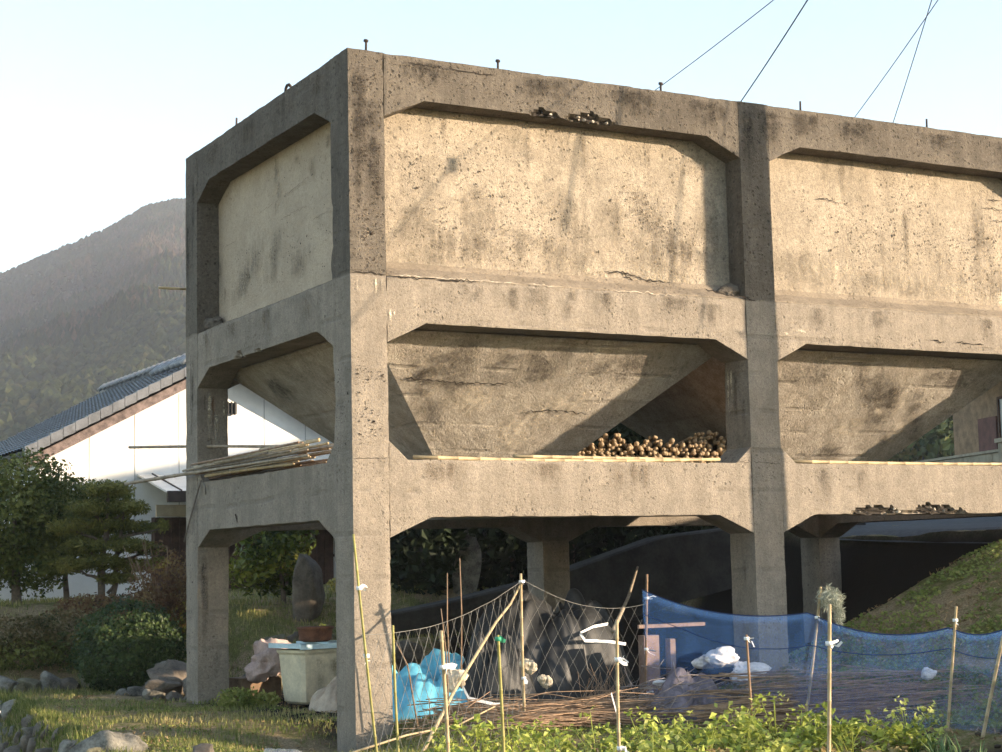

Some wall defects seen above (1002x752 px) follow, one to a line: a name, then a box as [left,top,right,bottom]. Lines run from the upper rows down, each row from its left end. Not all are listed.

damp [353,76,377,184]
crack [352,271,476,283]
crack [604,271,671,283]
crack [706,289,756,301]